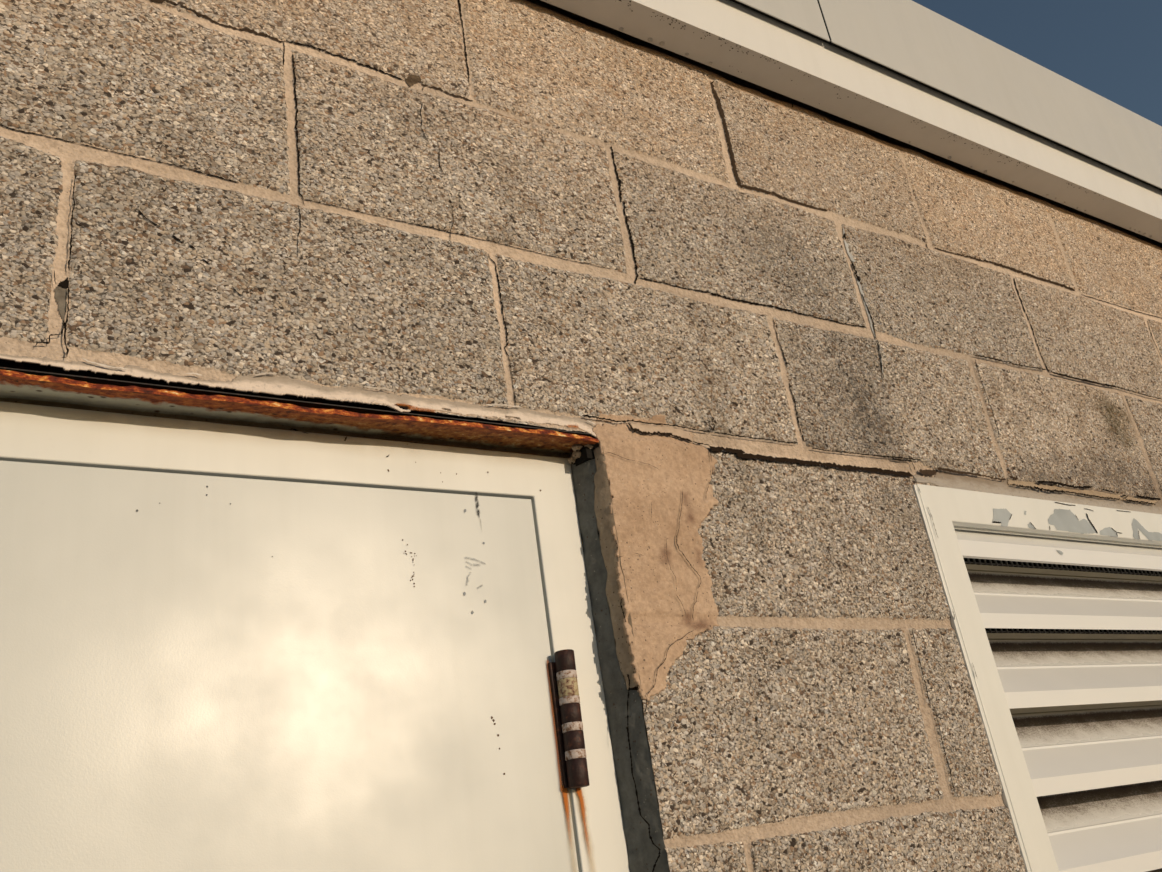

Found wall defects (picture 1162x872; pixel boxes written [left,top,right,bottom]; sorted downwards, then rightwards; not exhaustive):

crack [710,81,827,211]
spalling [54,277,69,326]
peeling [630,423,693,441]
crack [582,146,1162,872]
peeling [992,502,1162,541]
corrosion [547,661,588,844]